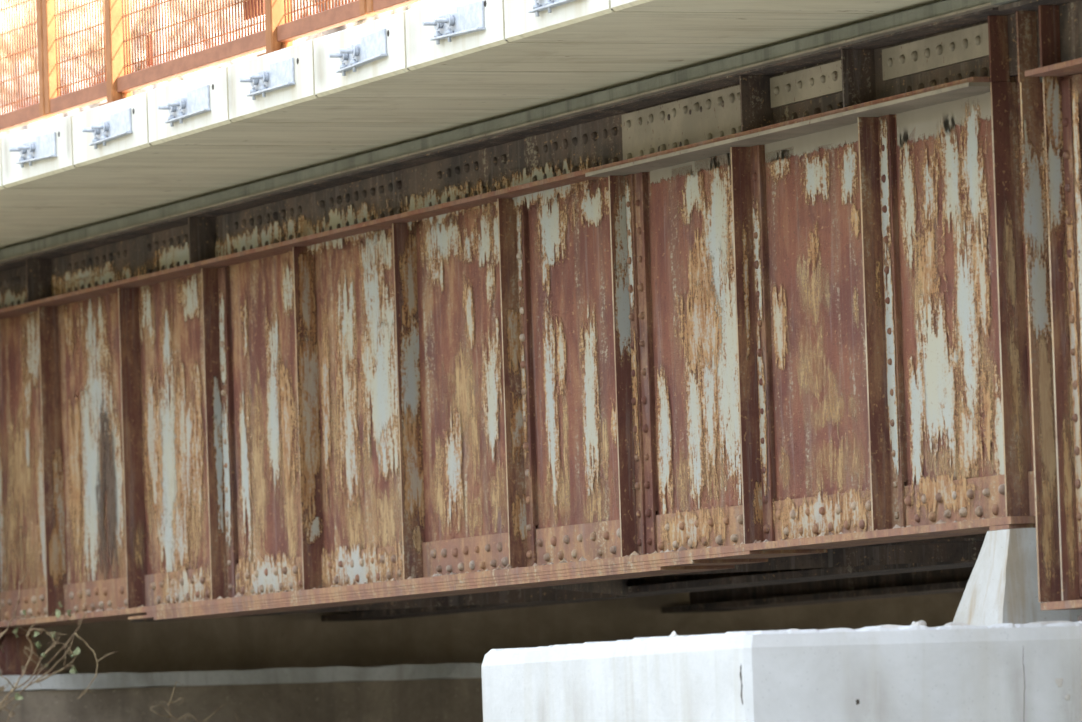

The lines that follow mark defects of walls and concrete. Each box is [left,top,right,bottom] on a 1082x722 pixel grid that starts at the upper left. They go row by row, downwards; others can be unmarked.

corrosion [4,402,36,590]
peeling [0,242,303,604]
corrosion [249,373,296,558]
corrosion [332,390,400,551]
peeling [215,156,640,587]
corrosion [449,341,480,481]
corrosion [541,403,569,523]
corrosion [797,253,863,494]
corrosion [929,372,978,480]
corrosion [1004,214,1022,481]
peeling [1015,76,1082,545]
corrosion [1038,332,1075,587]